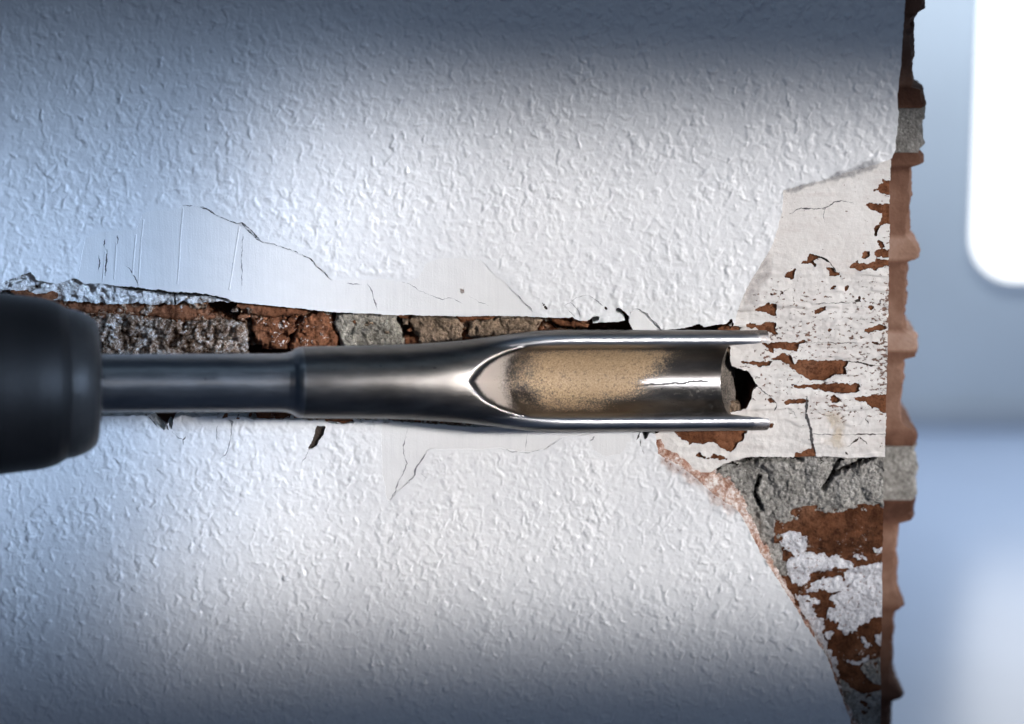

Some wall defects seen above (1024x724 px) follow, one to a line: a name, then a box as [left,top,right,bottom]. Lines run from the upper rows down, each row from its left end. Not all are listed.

crack [98,205,377,307]
peeling [784,179,889,291]
flaking render [628,309,661,330]
peeling [717,292,886,413]
crack [392,433,426,496]
crack [731,385,883,507]
spalling [656,431,884,724]